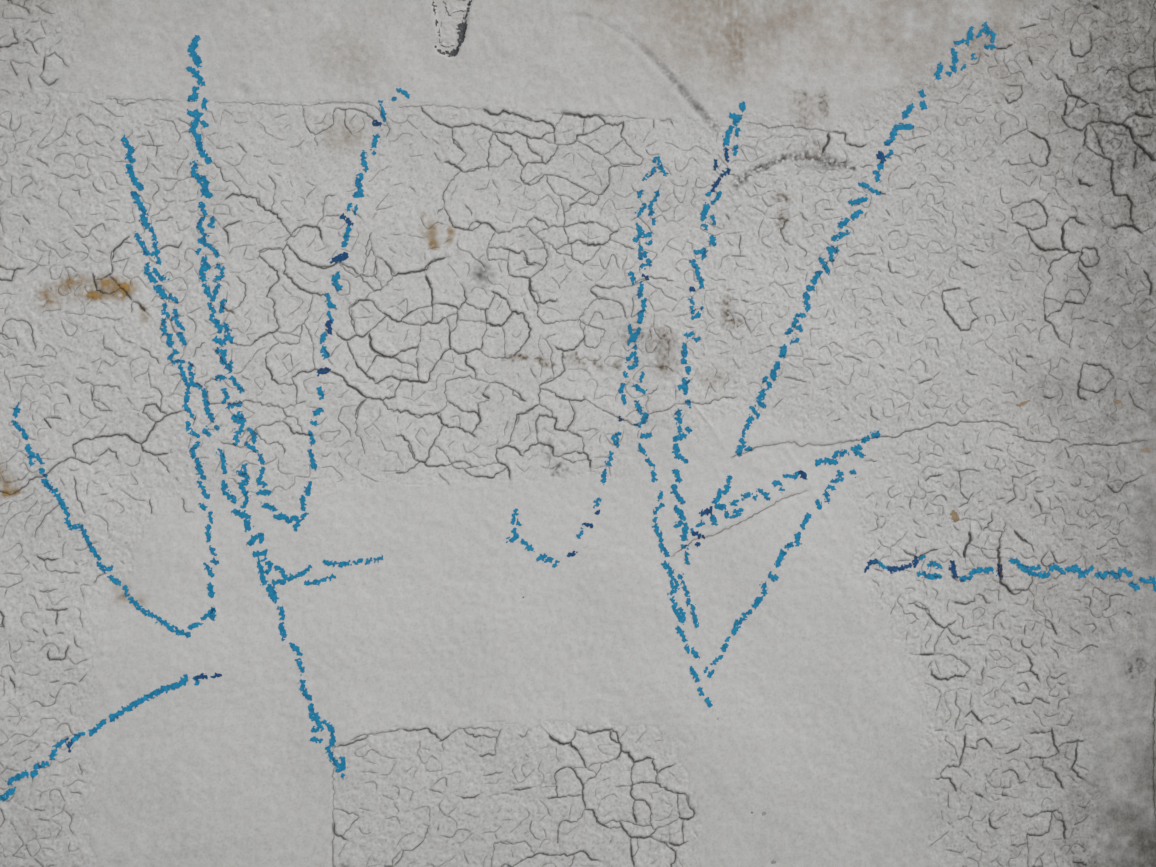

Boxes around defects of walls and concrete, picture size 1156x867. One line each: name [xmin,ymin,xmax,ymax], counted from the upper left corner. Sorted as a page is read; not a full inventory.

rust [86,279,130,300]
crack [0,78,217,867]
crack [663,26,1152,867]
crack [1148,680,1156,817]